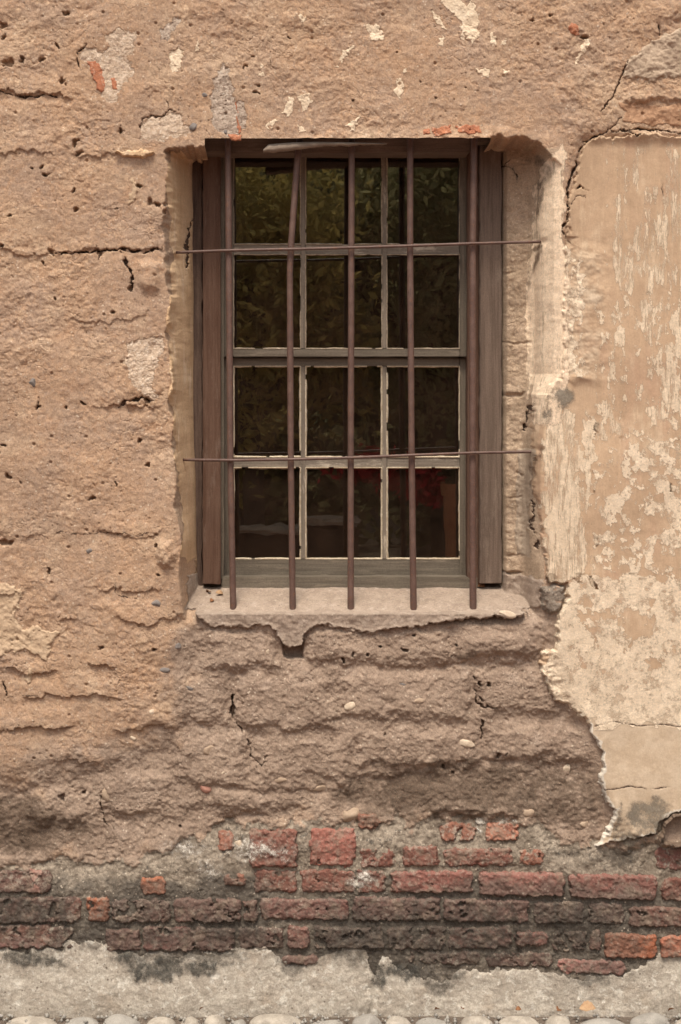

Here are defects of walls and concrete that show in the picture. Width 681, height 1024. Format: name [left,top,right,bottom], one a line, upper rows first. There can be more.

crack [562,61,681,237]
crack [55,220,193,292]
crack [523,405,535,431]
spalling [184,142,681,818]
crack [529,500,540,549]
crack [230,694,267,766]
crack [473,676,491,738]
spalling [657,812,681,847]